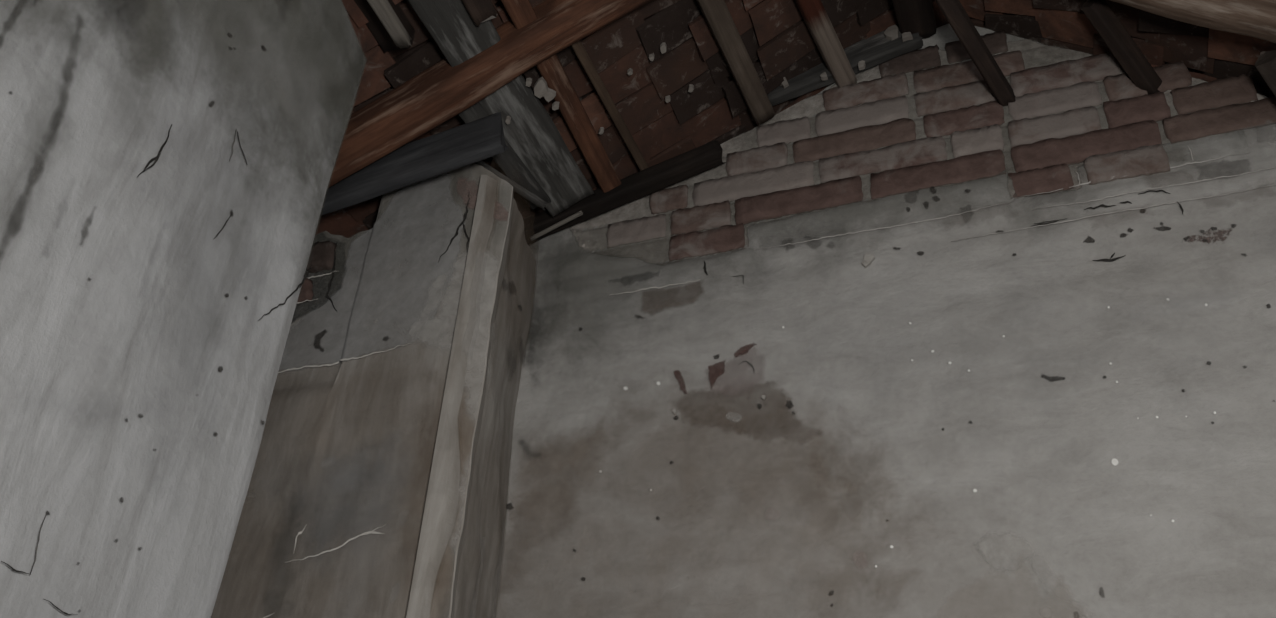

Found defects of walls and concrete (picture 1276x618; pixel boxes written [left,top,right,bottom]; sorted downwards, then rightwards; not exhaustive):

crack [137,124,172,178]
flaking render [570,31,1276,318]
crack [258,265,312,321]
peeling [278,173,479,373]
peeling [465,253,522,418]
crack [1,511,77,615]